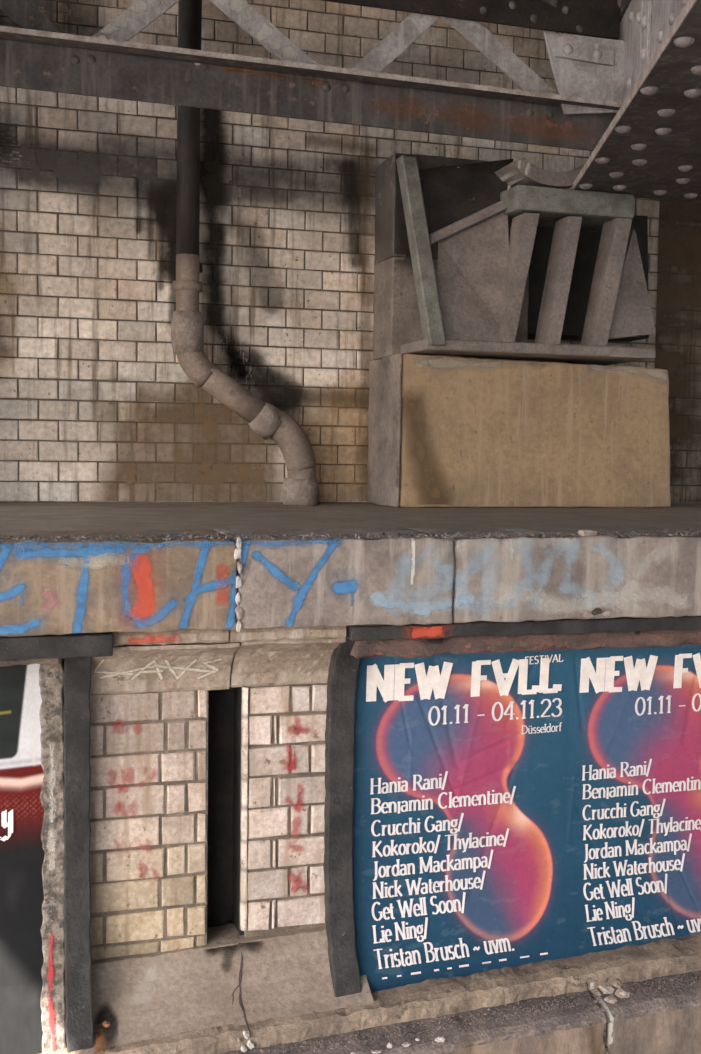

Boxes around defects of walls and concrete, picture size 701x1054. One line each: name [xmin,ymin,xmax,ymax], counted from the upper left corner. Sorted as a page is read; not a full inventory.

leakage [341,153,371,300]
leakage [362,338,372,406]
crack [232,952,251,1054]